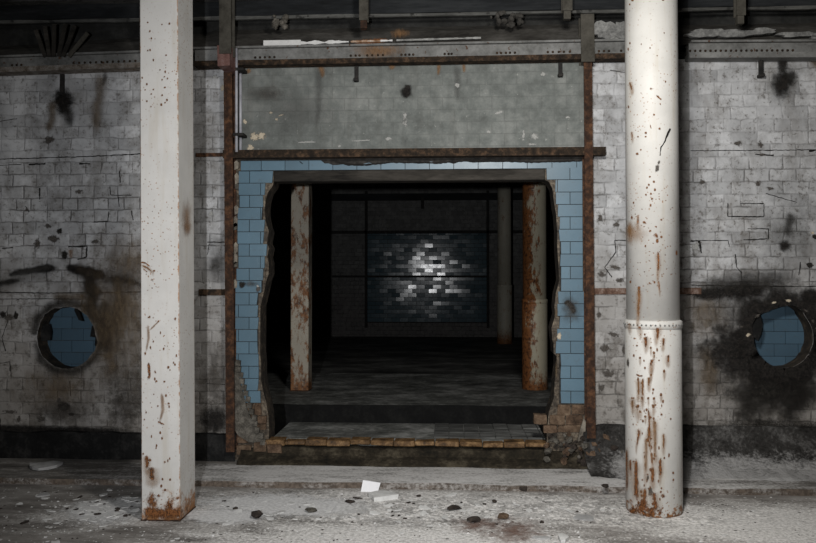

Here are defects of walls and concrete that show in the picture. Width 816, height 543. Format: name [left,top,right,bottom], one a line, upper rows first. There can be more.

peeling [594,20,625,39]
peeling [683,27,816,39]
leakage [123,254,141,272]
leakage [119,373,141,414]
flaking render [234,360,283,455]
rust [626,323,672,517]
rust [142,453,180,519]